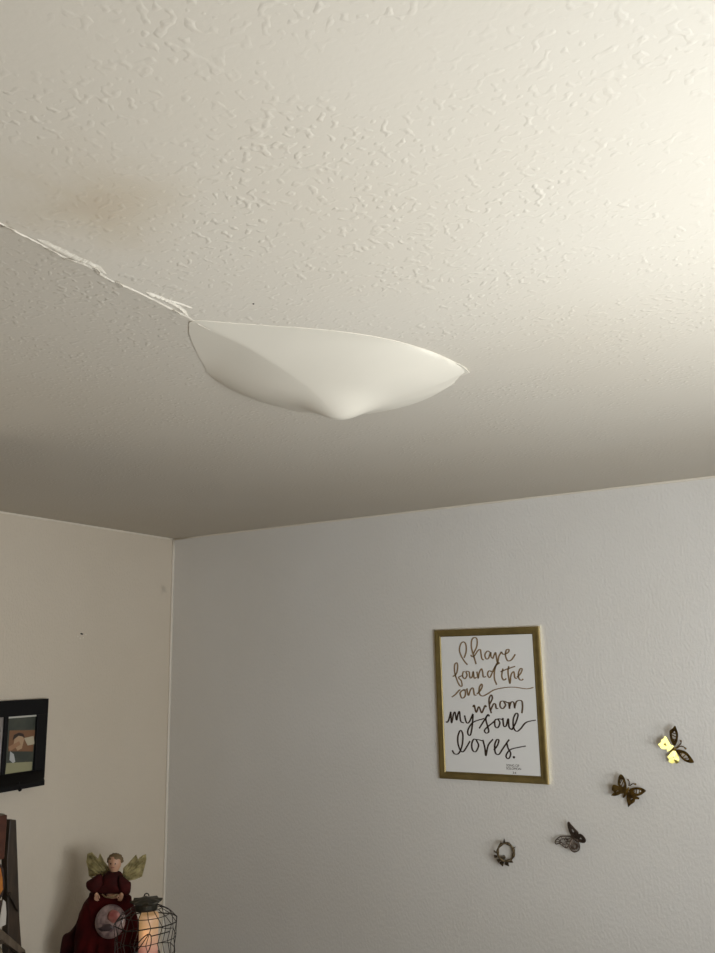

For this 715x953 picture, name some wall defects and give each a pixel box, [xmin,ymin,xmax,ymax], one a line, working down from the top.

crack [0,222,194,321]